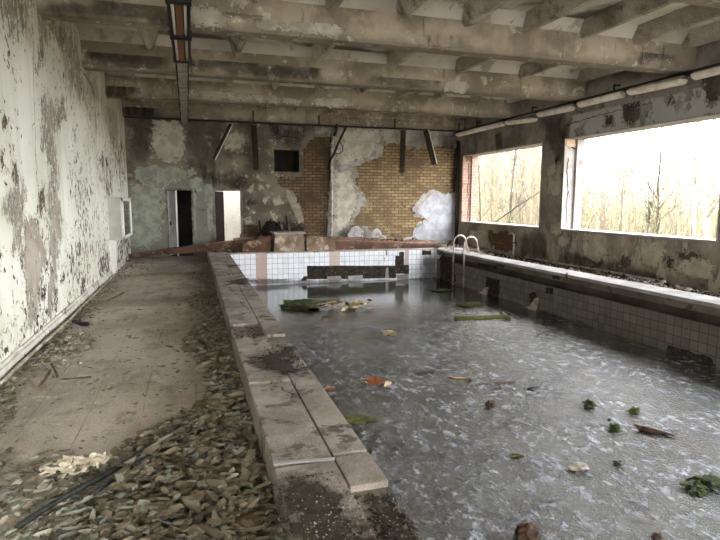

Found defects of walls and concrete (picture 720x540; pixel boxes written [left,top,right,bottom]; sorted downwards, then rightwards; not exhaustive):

peeling [251,17,354,41]
peeling [197,90,302,106]
peeling [314,94,354,109]
peeling [441,81,471,95]
damp [188,129,244,187]
peeling [0,0,106,360]
peeling [96,119,214,251]
spalling [270,127,457,241]
spalling [240,225,264,237]
spalling [468,229,517,253]
peeling [302,252,409,281]